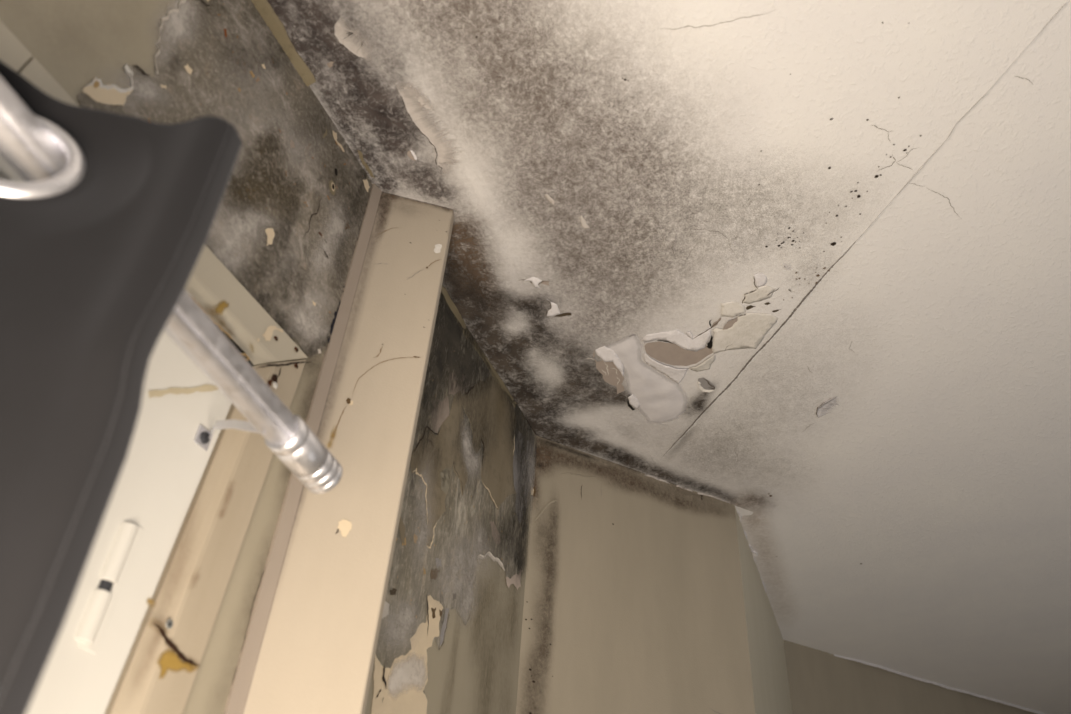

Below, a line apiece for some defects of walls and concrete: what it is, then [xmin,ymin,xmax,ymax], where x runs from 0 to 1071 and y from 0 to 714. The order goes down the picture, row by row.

peeling [77,0,372,356]
water stain [227,134,296,205]
water stain [267,0,450,229]
peeling [396,85,454,170]
water stain [420,0,680,295]
crack [662,10,774,30]
crack [873,125,957,214]
peeling [371,294,536,714]
water stain [416,221,731,573]
peeling [607,273,791,423]